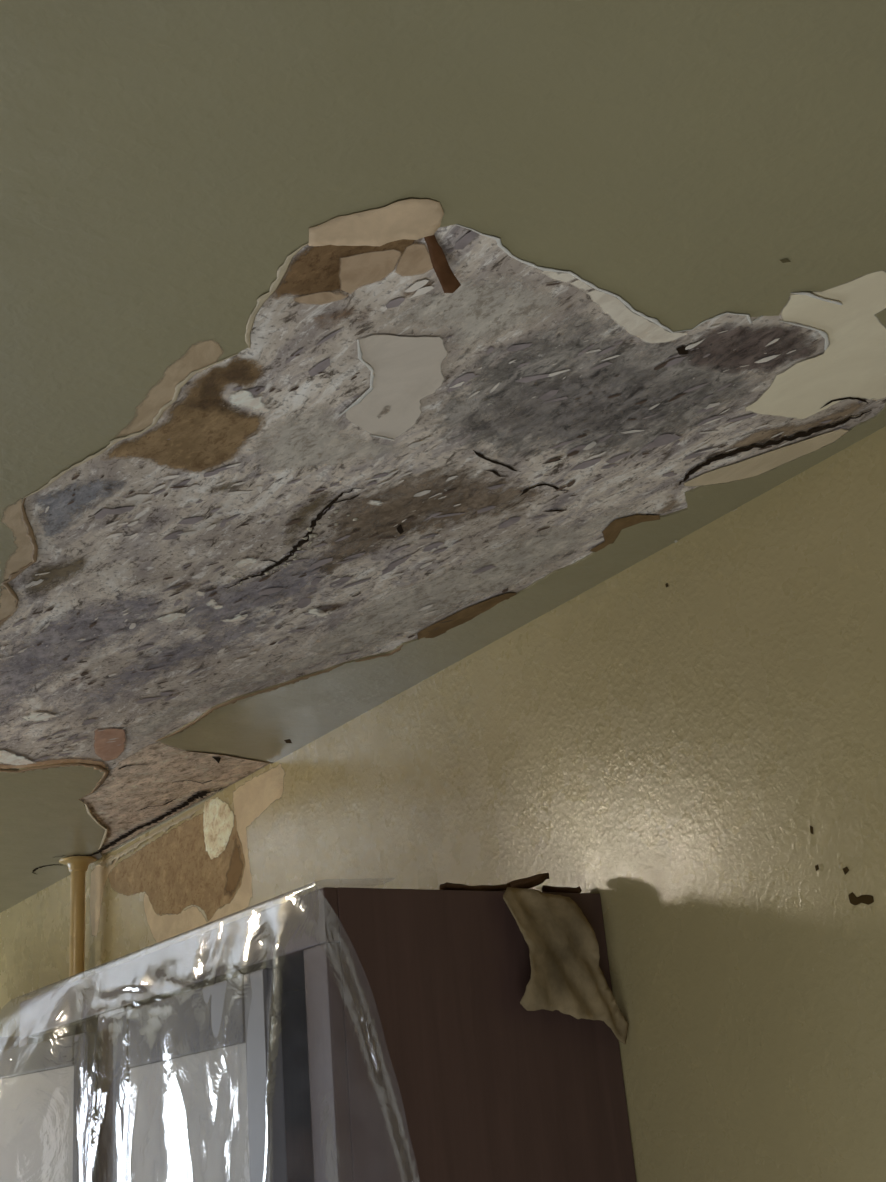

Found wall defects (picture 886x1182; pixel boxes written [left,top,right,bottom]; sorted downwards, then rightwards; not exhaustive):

damp [274,239,416,299]
damp [108,358,262,472]
damp [437,316,815,458]
crack [679,397,872,485]
damp [27,559,84,595]
crack [223,488,365,588]
damp [317,466,539,575]
spalling [0,198,886,950]
damp [417,593,516,640]
damp [590,515,660,552]